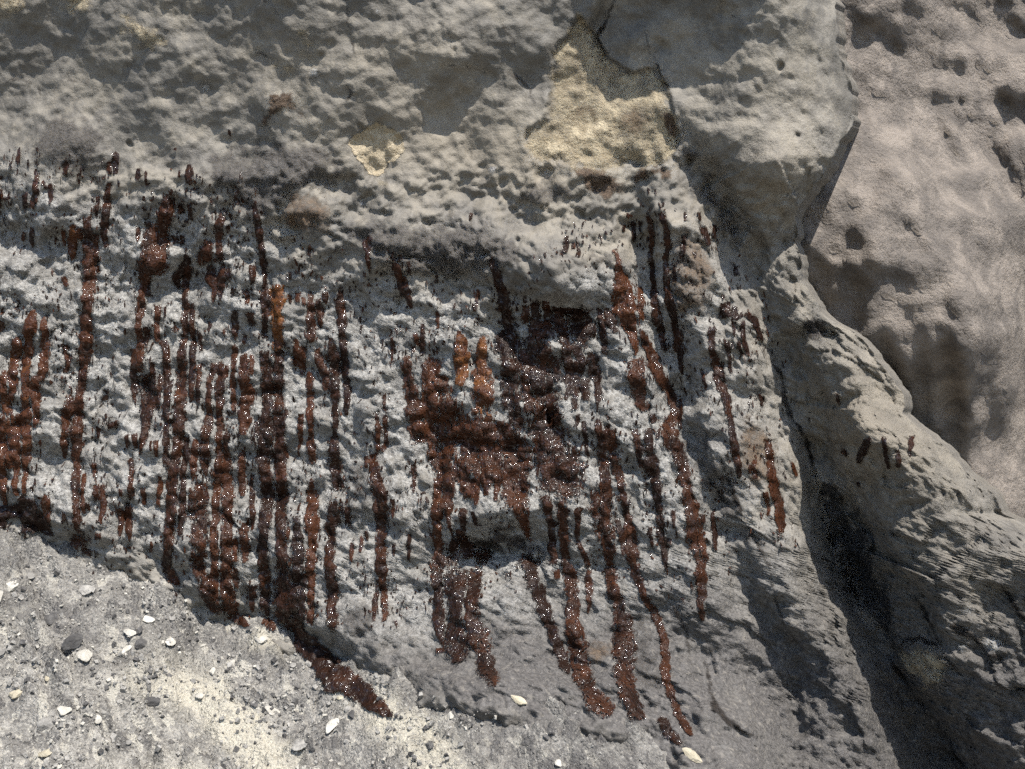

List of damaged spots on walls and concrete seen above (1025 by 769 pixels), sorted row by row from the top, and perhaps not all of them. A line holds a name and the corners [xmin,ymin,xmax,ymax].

spalling [526,15,677,169]
damp [34,118,104,168]
spalling [348,122,405,176]
damp [202,144,341,217]
damp [346,223,519,281]
rust [0,147,807,745]
rust [841,435,915,469]